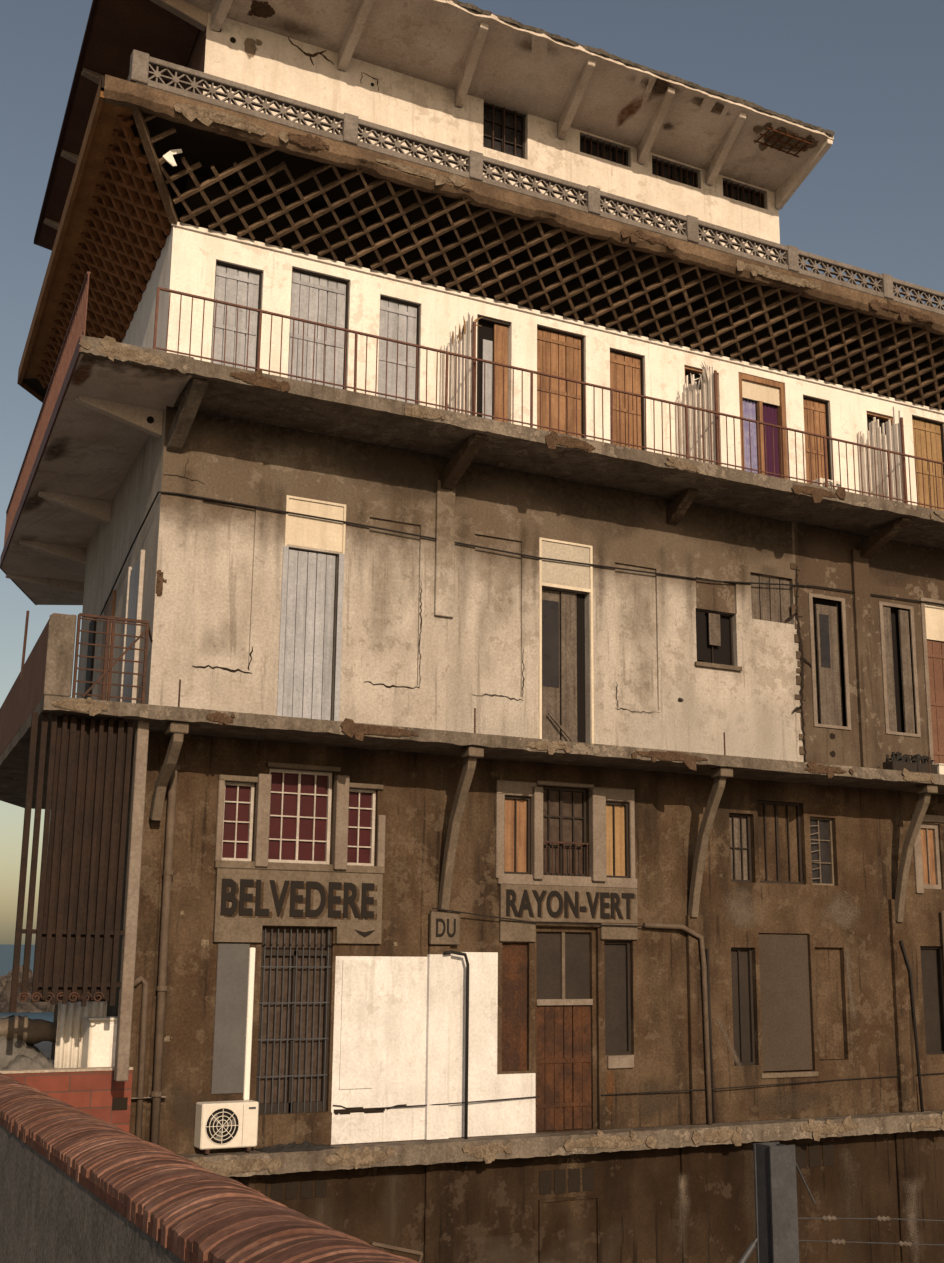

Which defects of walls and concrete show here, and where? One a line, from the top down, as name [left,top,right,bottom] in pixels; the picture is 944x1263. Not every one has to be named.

spalling [248,0,275,19]
peeling [245,38,262,58]
crack [288,37,379,91]
spalling [753,123,819,158]
crack [364,580,422,689]
crack [192,647,253,674]
crack [472,649,525,701]
crack [333,1104,407,1115]